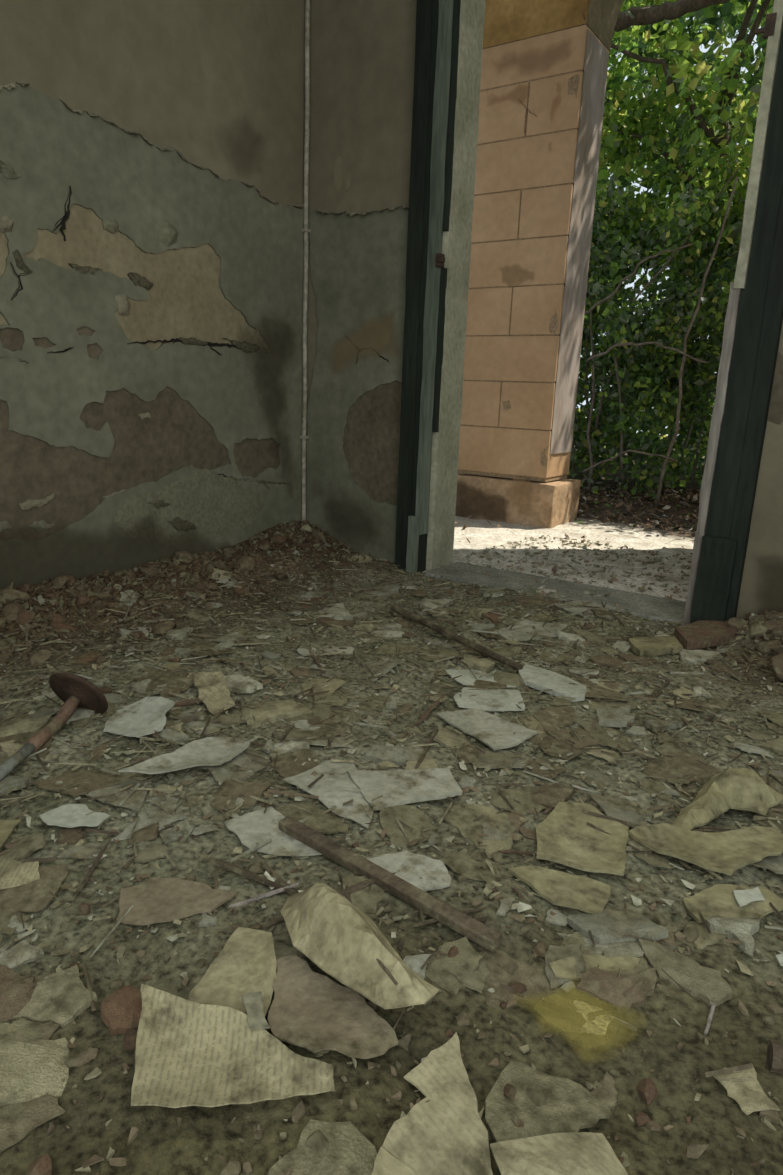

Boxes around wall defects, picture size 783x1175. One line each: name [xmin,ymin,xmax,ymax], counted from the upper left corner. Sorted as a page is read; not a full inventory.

crack [52,186,72,241]
crack [10,262,28,300]
crack [127,338,267,355]
peeling [0,82,409,589]